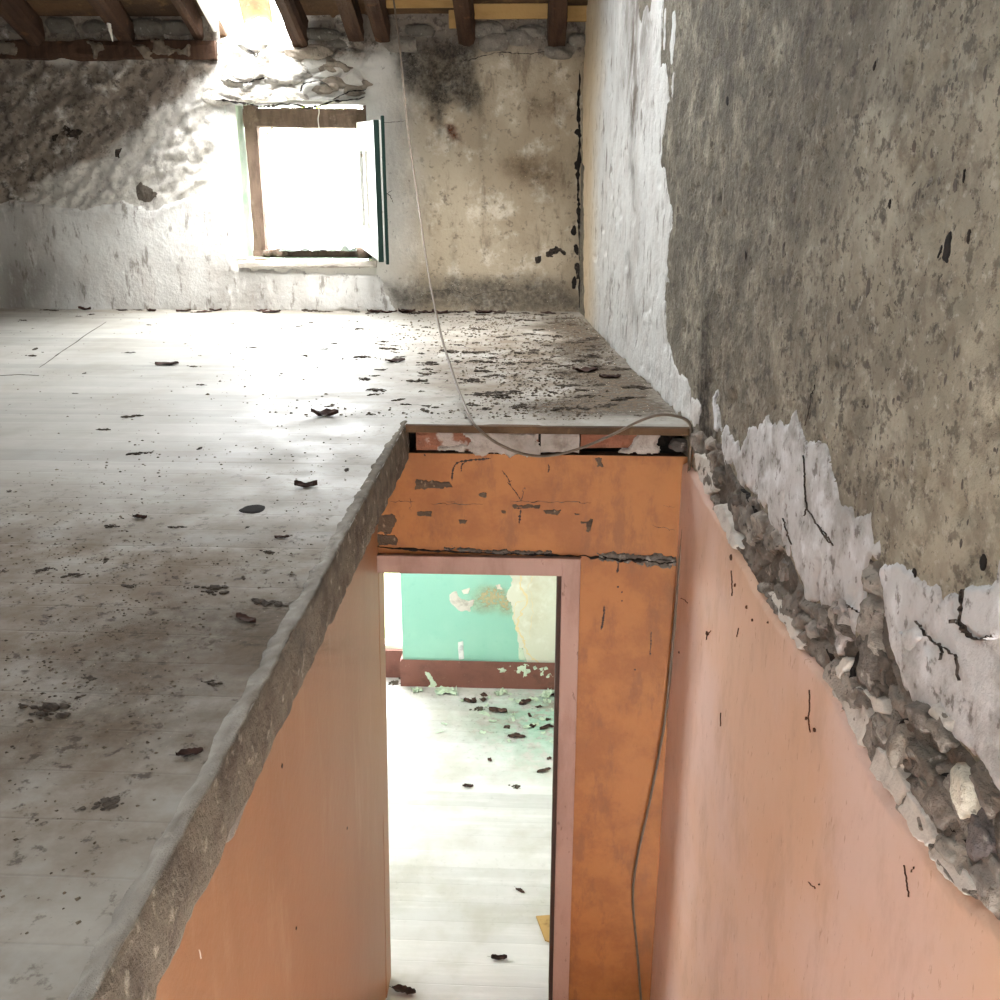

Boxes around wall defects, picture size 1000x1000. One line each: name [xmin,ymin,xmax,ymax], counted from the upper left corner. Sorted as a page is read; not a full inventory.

damp [398,44,478,111]
peeling [0,182,395,311]
spalling [535,246,566,264]
damp [392,279,578,311]
peeling [377,514,398,546]
peeling [415,479,452,490]
crack [377,546,671,563]
peeling [574,0,1000,920]
crack [782,455,834,546]
peeling [449,588,474,612]
peeling [495,575,557,699]
crack [914,589,994,681]